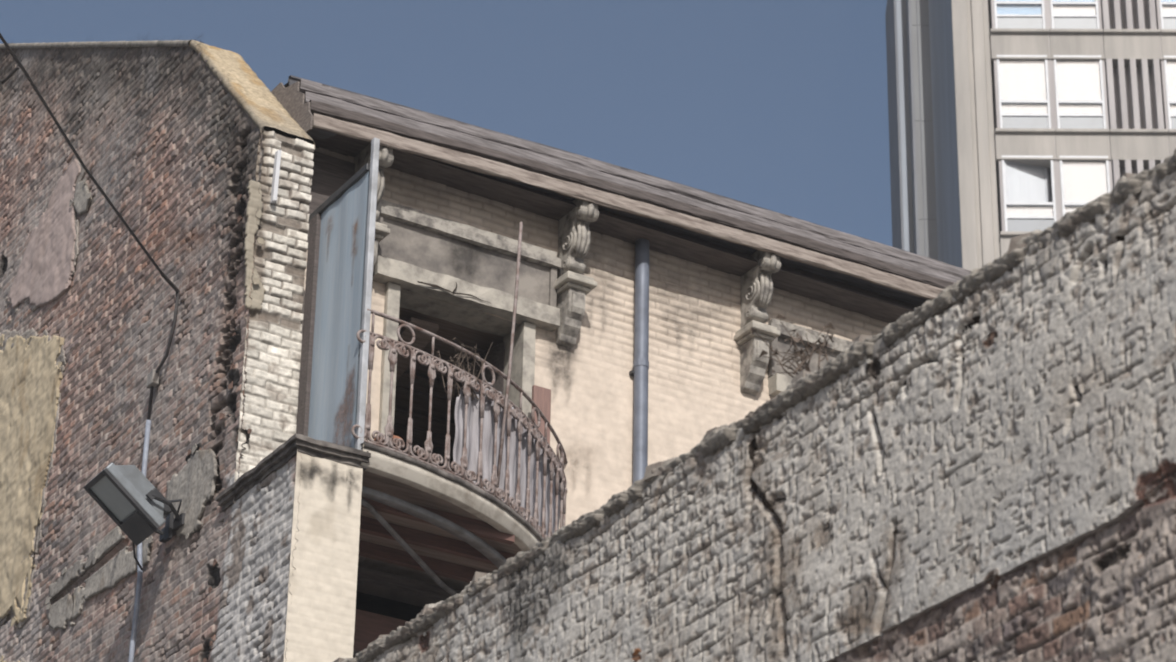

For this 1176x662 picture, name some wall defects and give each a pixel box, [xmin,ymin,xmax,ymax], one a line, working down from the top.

flaking render [0,159,91,314]
spalling [983,331,998,347]
spalling [228,363,240,389]
spalling [865,357,882,378]
spalling [185,442,202,461]
flaking render [0,328,67,629]
water stain [301,466,338,488]
spalling [207,559,221,593]
crack [748,437,789,655]
flaking render [830,463,1176,662]